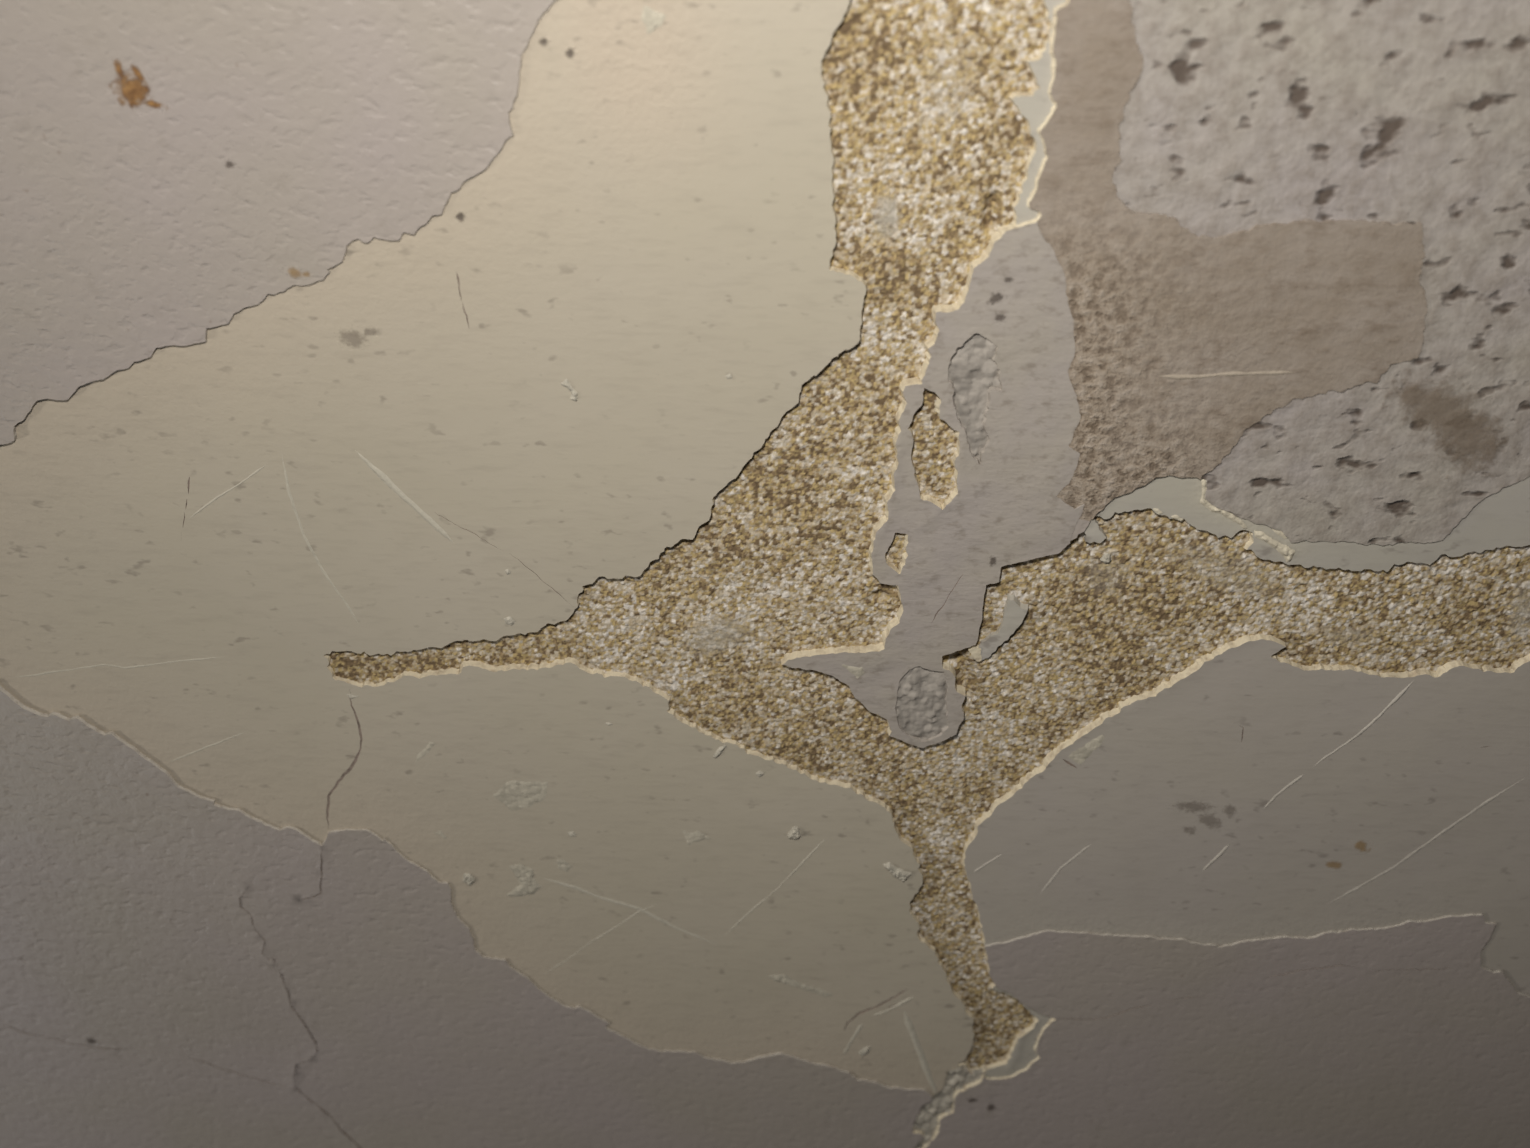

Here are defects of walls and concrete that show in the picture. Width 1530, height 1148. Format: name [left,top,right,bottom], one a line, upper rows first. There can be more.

corrosion [109,60,161,108]
crack [239,893,361,1148]
peeling [0,0,974,1097]
spalling [324,0,1530,1148]